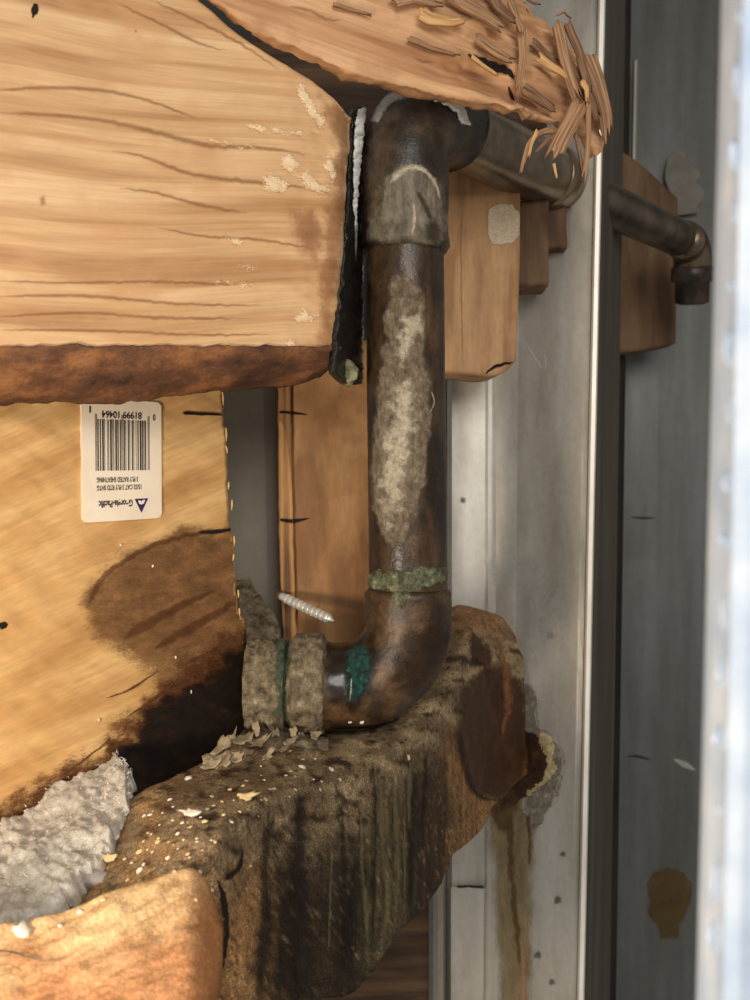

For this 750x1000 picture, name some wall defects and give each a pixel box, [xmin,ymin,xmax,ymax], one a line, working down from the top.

leakage [0,526,247,822]
leakage [256,818,273,989]
leakage [289,800,313,994]
leakage [328,752,429,970]
rust [490,684,565,1000]